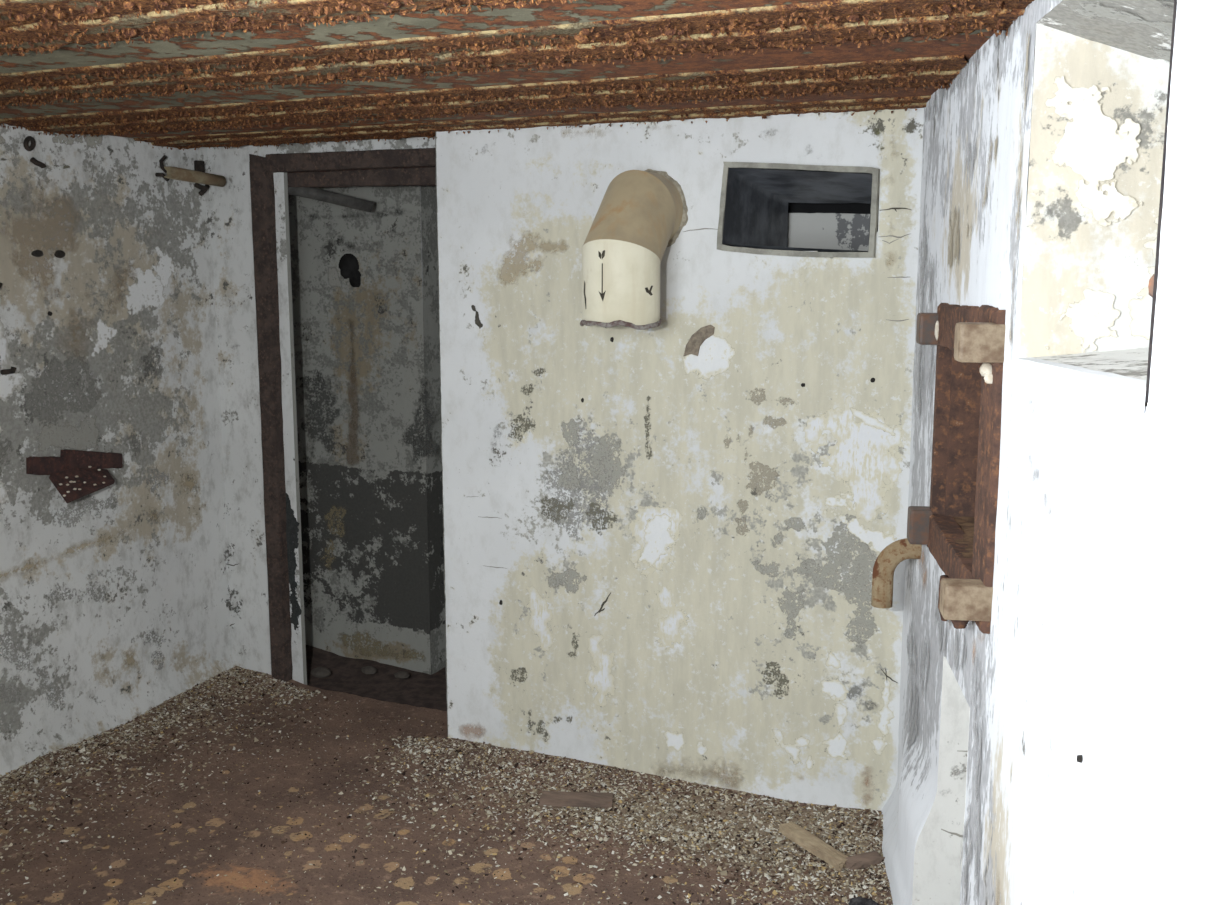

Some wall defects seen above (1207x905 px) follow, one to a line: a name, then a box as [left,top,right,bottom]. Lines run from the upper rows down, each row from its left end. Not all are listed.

peeling [124,246,175,316]
peeling [0,298,26,403]
peeling [85,317,118,357]
damp [683,335,735,380]
damp [979,363,993,384]
peeling [724,389,794,446]
damp [536,419,689,650]
peeling [735,454,779,535]
damp [804,396,902,552]
peeling [752,514,877,648]
damp [761,662,789,699]
damp [772,596,982,902]